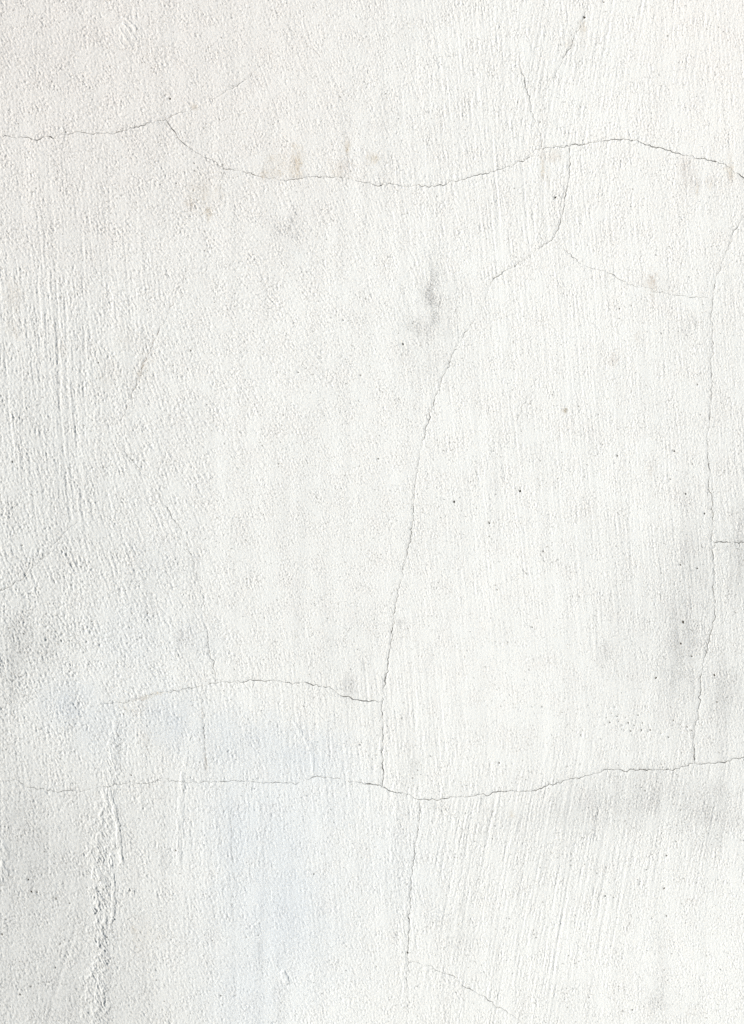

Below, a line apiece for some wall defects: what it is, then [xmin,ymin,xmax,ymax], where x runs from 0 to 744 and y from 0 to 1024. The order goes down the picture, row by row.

crack [207,417,744,983]